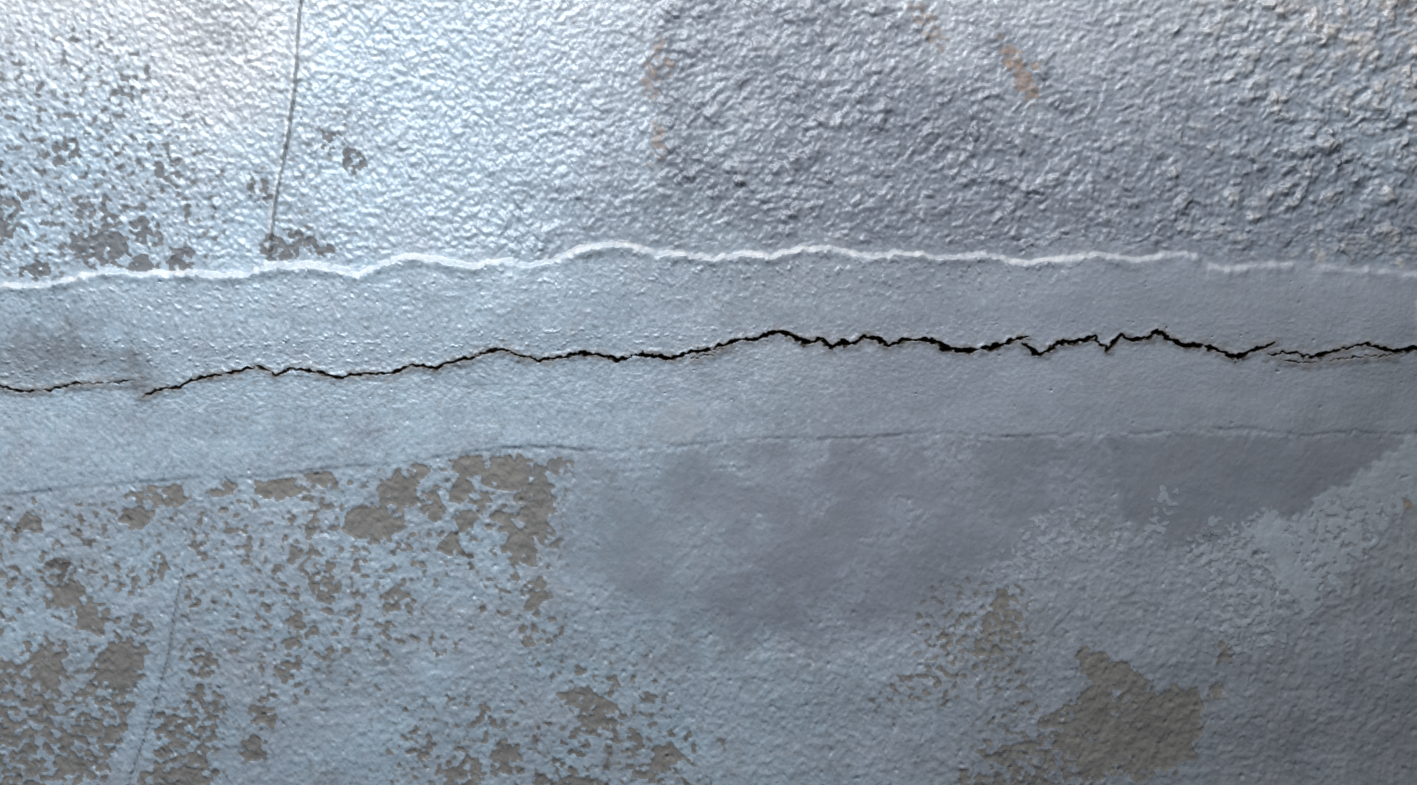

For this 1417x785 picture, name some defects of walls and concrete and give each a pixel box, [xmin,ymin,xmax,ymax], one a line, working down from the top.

damp [773,4,816,45]
peeling [0,29,225,281]
peeling [247,167,273,203]
peeling [260,225,335,261]
peeling [321,130,367,175]
damp [653,14,831,232]
damp [860,77,980,162]
crack [11,329,1417,398]
peeling [1186,436,1417,665]
peeling [0,454,573,785]
peeling [871,508,1223,785]
peeling [387,664,700,785]